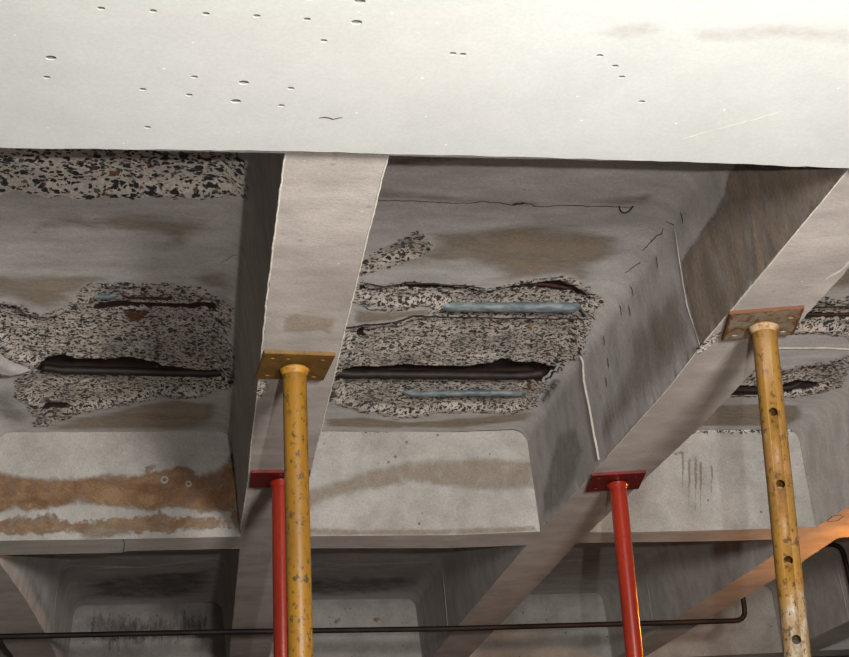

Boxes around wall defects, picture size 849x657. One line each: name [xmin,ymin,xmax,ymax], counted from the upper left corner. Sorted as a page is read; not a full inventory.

spalling [0,148,248,200]
crack [378,200,631,208]
leakage [432,228,607,275]
spalling [329,231,604,420]
spalling [794,296,849,340]
spalling [0,282,236,427]
spalling [254,381,269,398]
spalling [729,370,758,398]
spalling [781,355,849,398]
rust [0,454,239,537]